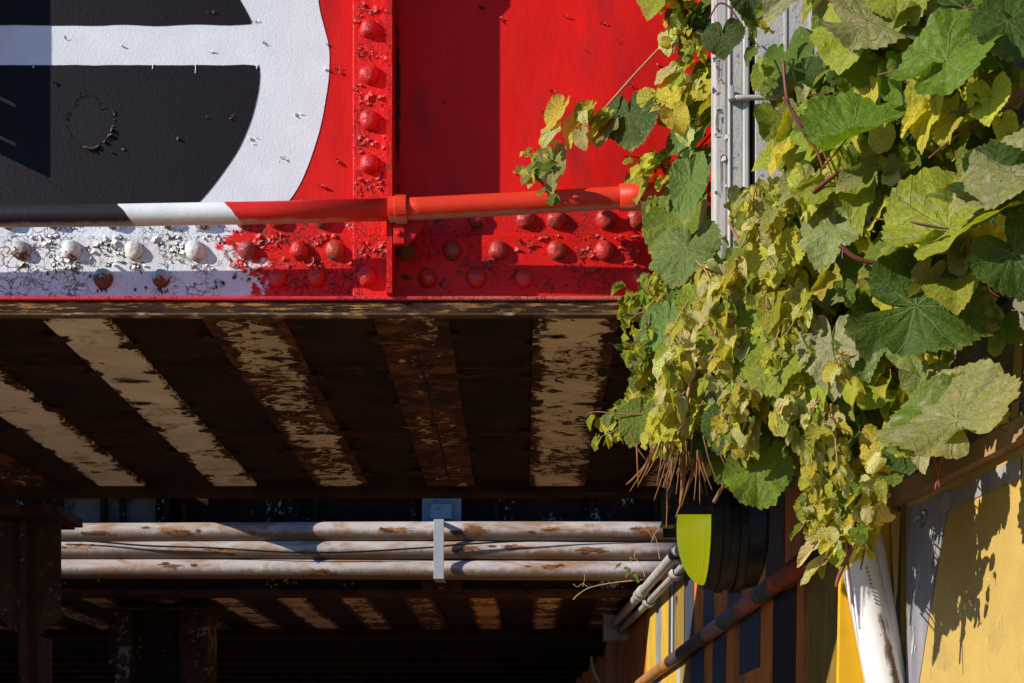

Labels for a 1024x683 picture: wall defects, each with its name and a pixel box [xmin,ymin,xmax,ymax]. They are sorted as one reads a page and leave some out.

peeling [350,1,386,22]
peeling [353,83,385,107]
peeling [356,132,384,153]
peeling [17,233,148,281]
peeling [134,222,353,292]
peeling [339,241,386,267]
peeling [435,234,559,288]
peeling [556,233,641,273]
rust [61,530,115,550]
rust [140,526,201,537]
rust [452,525,530,553]
rust [627,526,663,534]